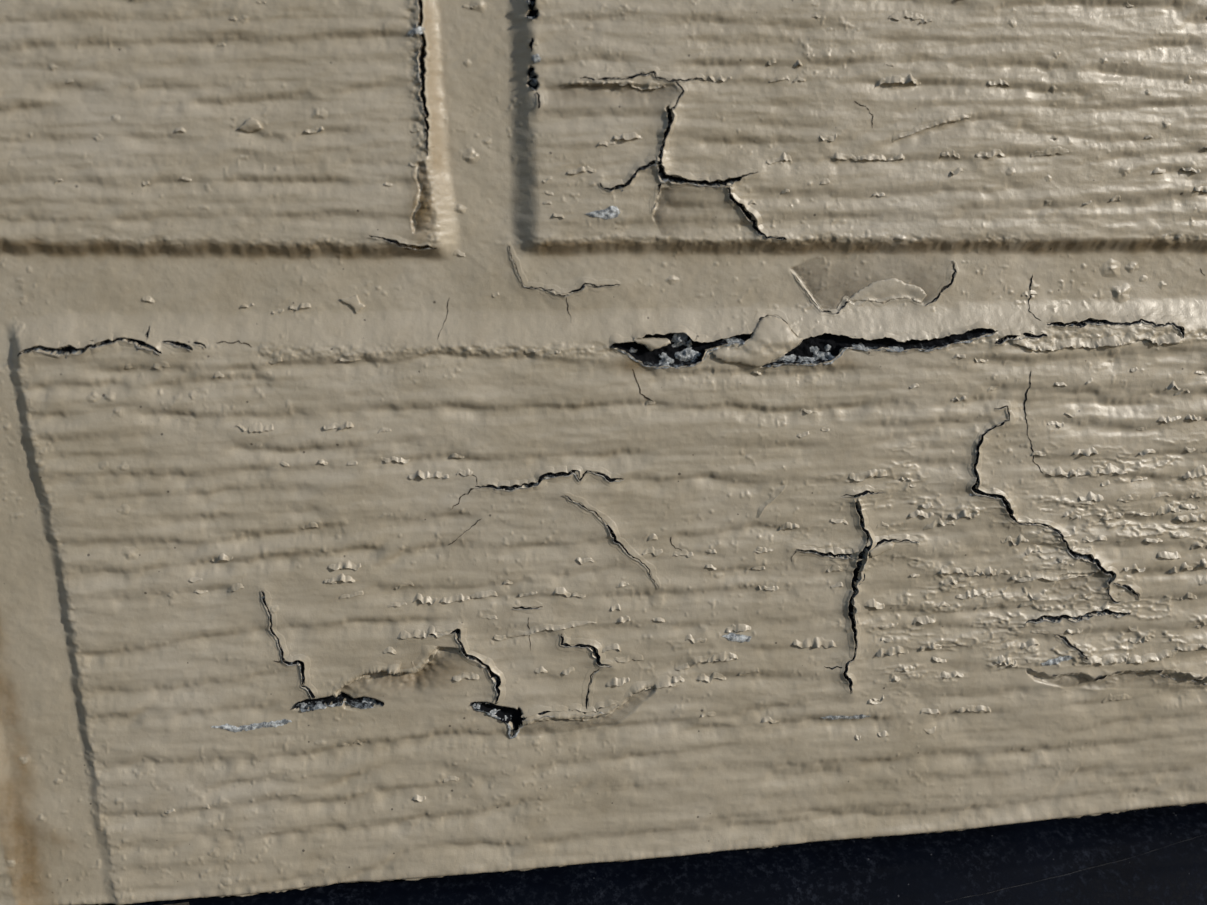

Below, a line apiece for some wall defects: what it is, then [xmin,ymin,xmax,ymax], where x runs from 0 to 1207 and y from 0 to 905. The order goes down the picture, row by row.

crack [580,66,787,245]
spalling [609,267,998,375]
crack [994,275,1187,346]
crack [448,465,681,589]
peeling [908,502,980,530]
crack [966,372,1143,660]
peeling [1043,446,1207,574]
crack [400,599,618,722]
crack [791,485,919,694]
peeling [875,534,1099,682]
peeling [994,626,1207,703]
peeling [1110,585,1138,603]